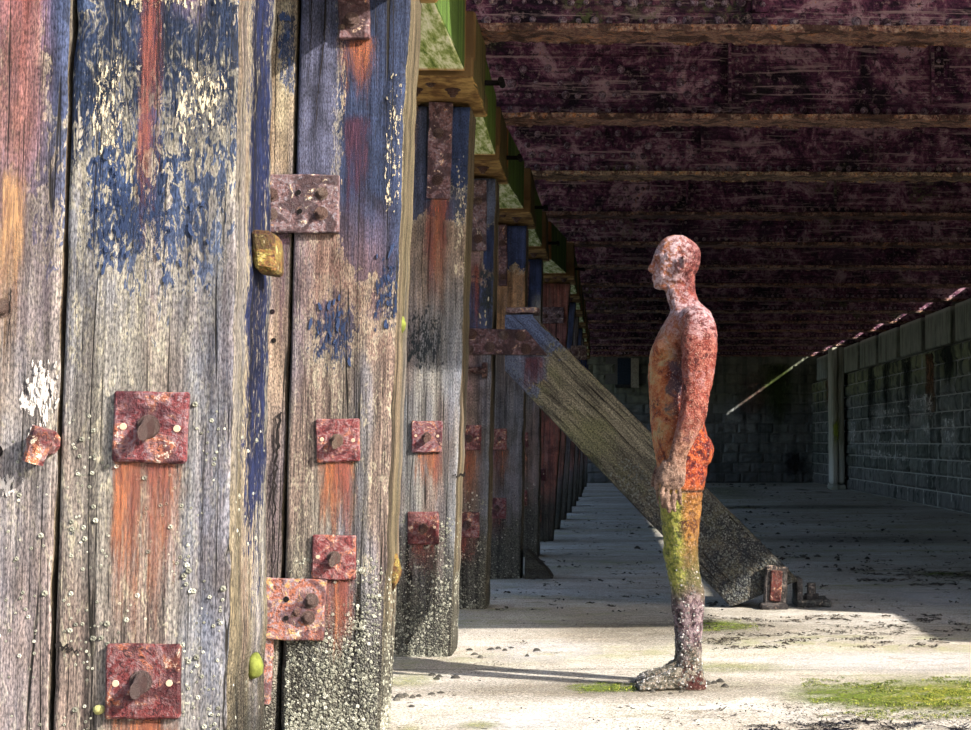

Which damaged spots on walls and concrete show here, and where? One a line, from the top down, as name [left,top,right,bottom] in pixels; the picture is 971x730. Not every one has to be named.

peeling [126,0,216,11]
peeling [176,57,227,154]
peeling [83,47,172,284]
peeling [308,294,353,370]
peeling [19,359,60,435]
water stain [864,357,931,461]
peeling [0,474,25,496]
corrosion [114,461,173,551]
corrosion [324,461,352,511]
corrosion [464,450,476,481]
corrosion [326,580,352,628]